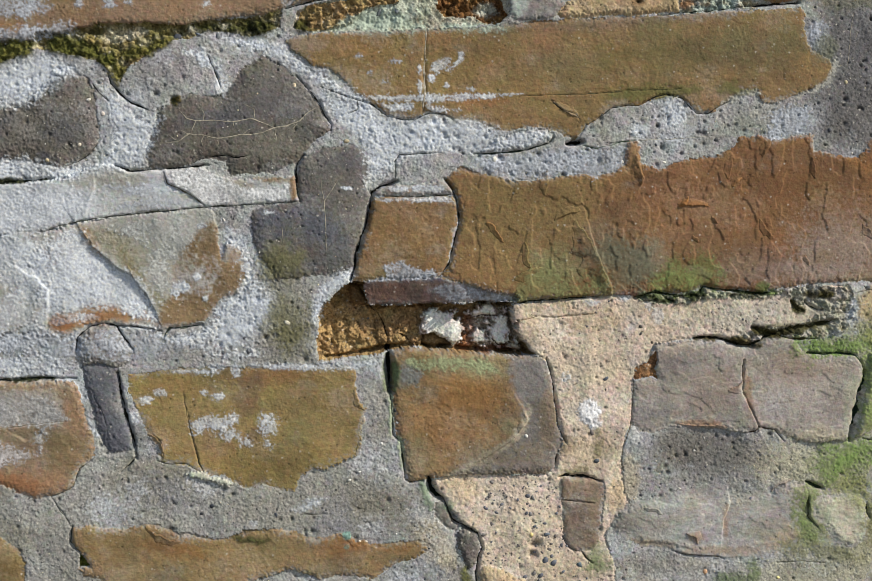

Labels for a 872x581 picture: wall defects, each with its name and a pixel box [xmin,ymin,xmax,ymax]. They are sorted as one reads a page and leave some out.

damp [182,47,231,95]
crack [44,29,446,232]
crack [633,286,872,440]
damp [192,413,253,447]
damp [257,413,276,446]